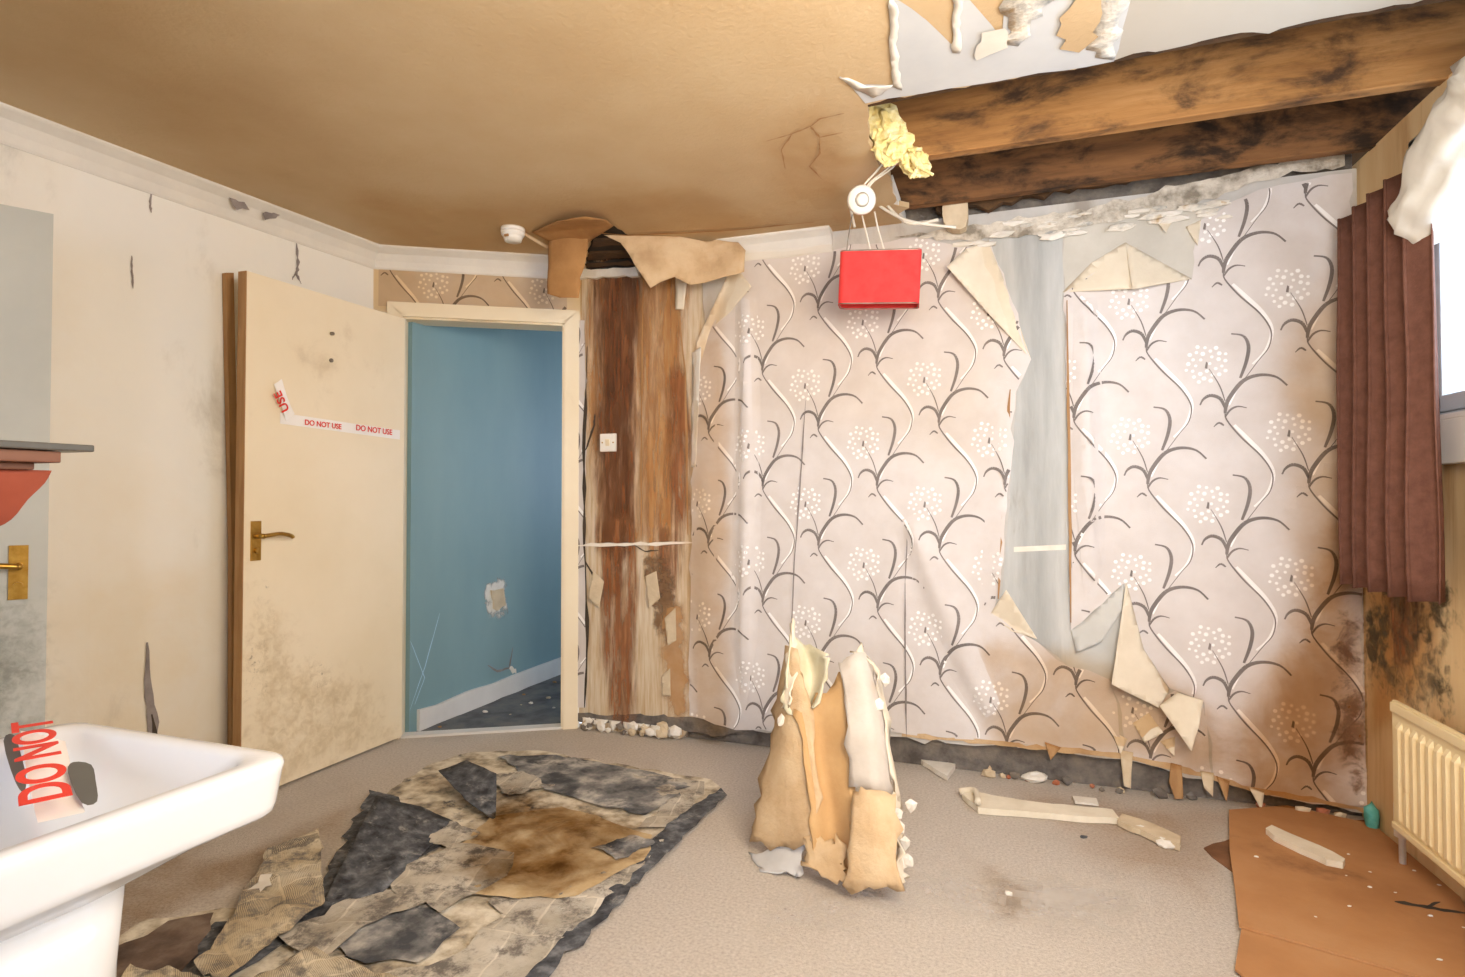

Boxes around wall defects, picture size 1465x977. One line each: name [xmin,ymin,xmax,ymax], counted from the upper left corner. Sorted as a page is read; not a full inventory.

peeling [839,0,1451,107]
spalling [580,225,641,280]
leakage [579,260,705,739]
spalling [485,580,507,617]
peeling [588,571,604,608]
peeling [644,557,676,645]
peeling [662,669,671,696]
leakage [1334,591,1450,700]
leakage [1338,695,1364,791]